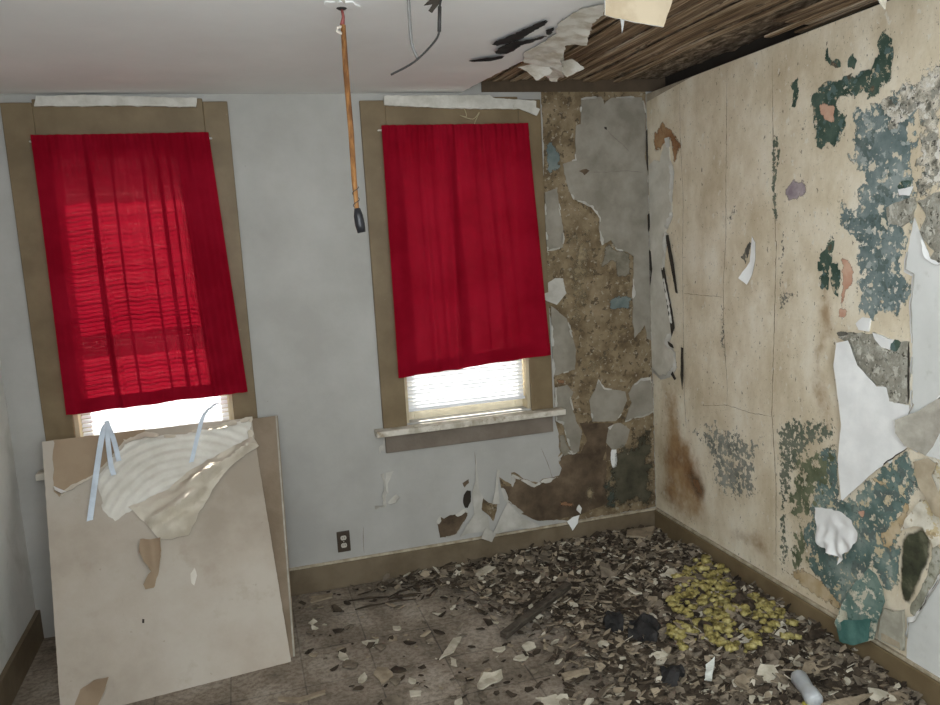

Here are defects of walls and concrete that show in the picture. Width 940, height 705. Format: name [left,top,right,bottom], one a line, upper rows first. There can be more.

peeling [324,0,361,11]
peeling [436,0,940,657]
damp [501,379,772,567]